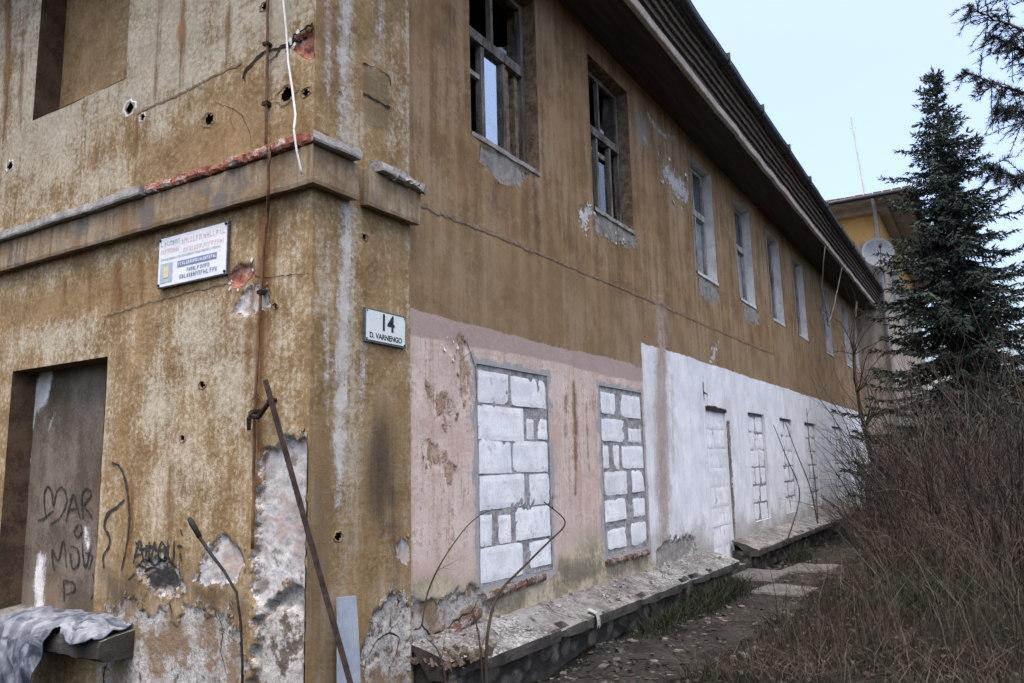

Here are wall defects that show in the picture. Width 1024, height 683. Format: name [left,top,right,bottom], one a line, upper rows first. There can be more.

crack [136,23,314,142]
flaking render [288,29,314,59]
water stain [327,0,350,112]
flaking render [228,257,279,319]
crack [421,203,774,355]
flaking render [578,203,638,251]
peeling [658,149,692,210]
water stain [326,204,351,502]
peeling [421,438,457,484]
rust [565,383,590,494]
flaking render [99,427,307,683]
flaking render [360,573,547,683]